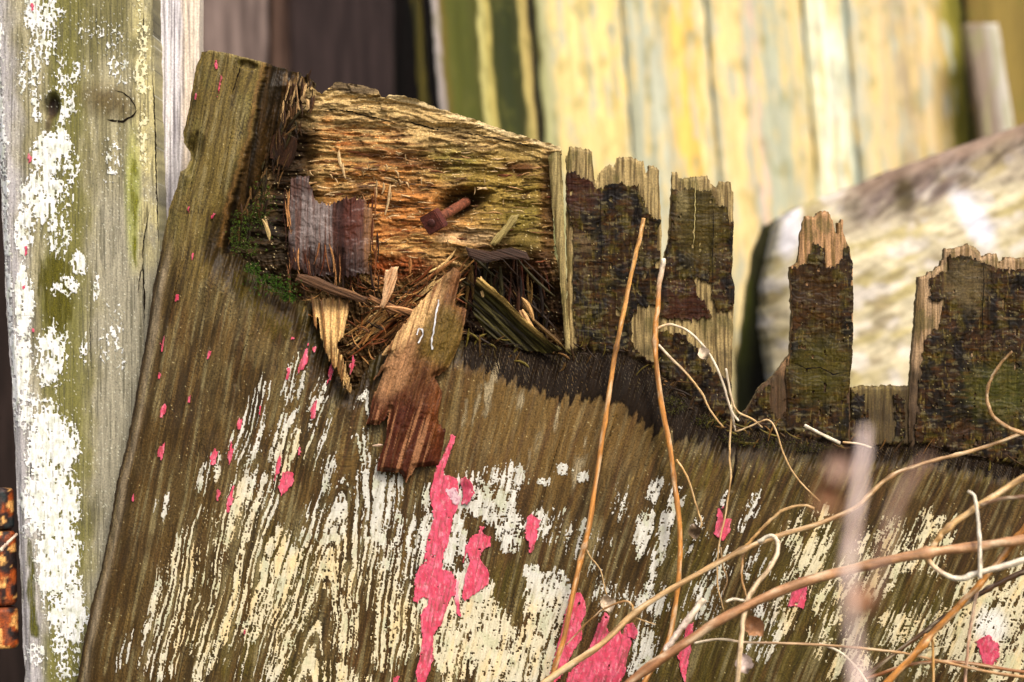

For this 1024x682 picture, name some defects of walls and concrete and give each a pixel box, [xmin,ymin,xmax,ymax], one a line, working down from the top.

peeling [0,0,127,682]
peeling [116,343,1024,682]